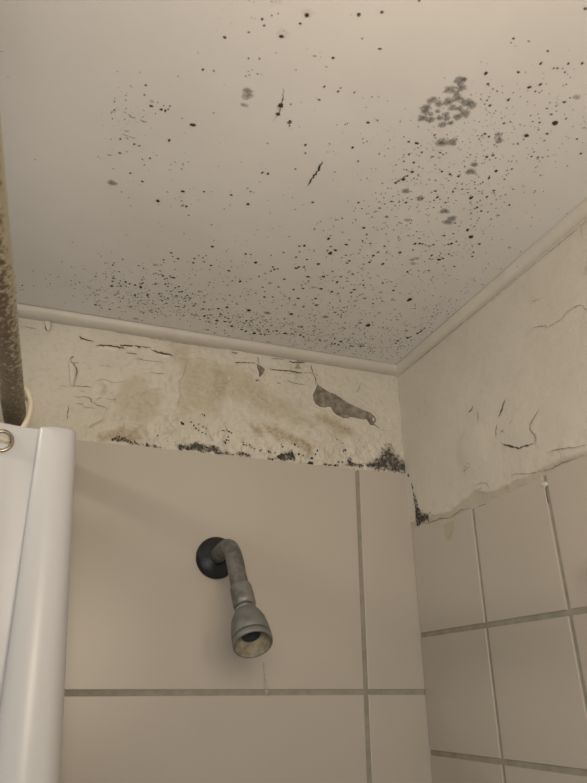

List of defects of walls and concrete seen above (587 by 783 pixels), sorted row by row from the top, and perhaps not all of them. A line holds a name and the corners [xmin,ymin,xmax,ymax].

damp [71,72,574,360]
crack [67,332,219,419]
damp [111,429,318,465]
flaking render [235,359,384,431]
damp [324,439,429,526]
crack [469,401,539,449]
crack [514,445,585,475]